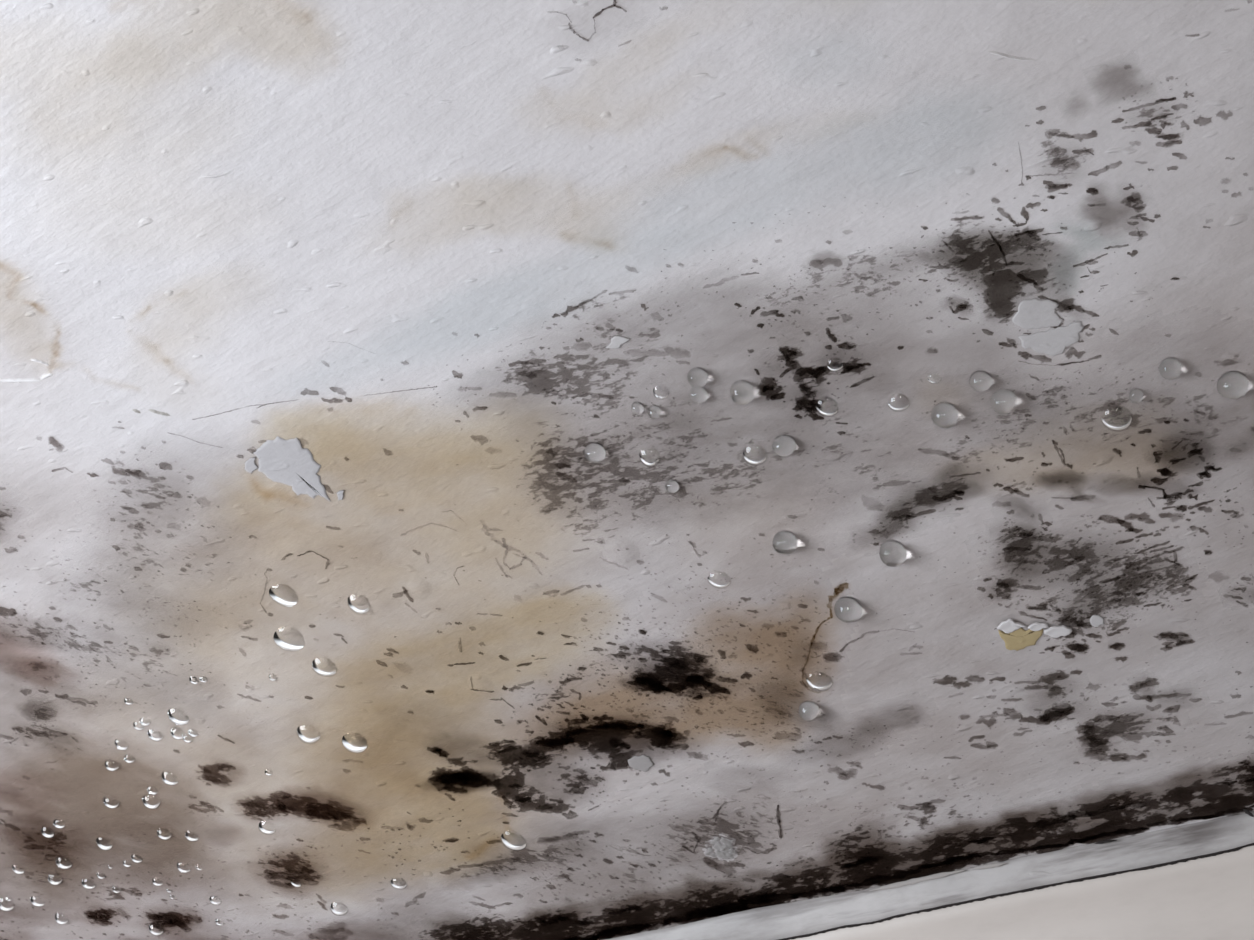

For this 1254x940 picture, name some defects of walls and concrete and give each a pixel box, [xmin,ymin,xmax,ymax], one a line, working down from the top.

crack [579,0,623,40]
mould [945,232,1037,317]
water stain [752,329,872,434]
peeling [245,436,344,502]
mould [1138,443,1233,532]
mould [593,630,752,699]
spalling [997,619,1072,651]
mould [1042,629,1126,685]
mould [427,667,689,824]
mould [248,792,366,823]
water stain [431,760,1254,940]
mould [151,912,201,928]